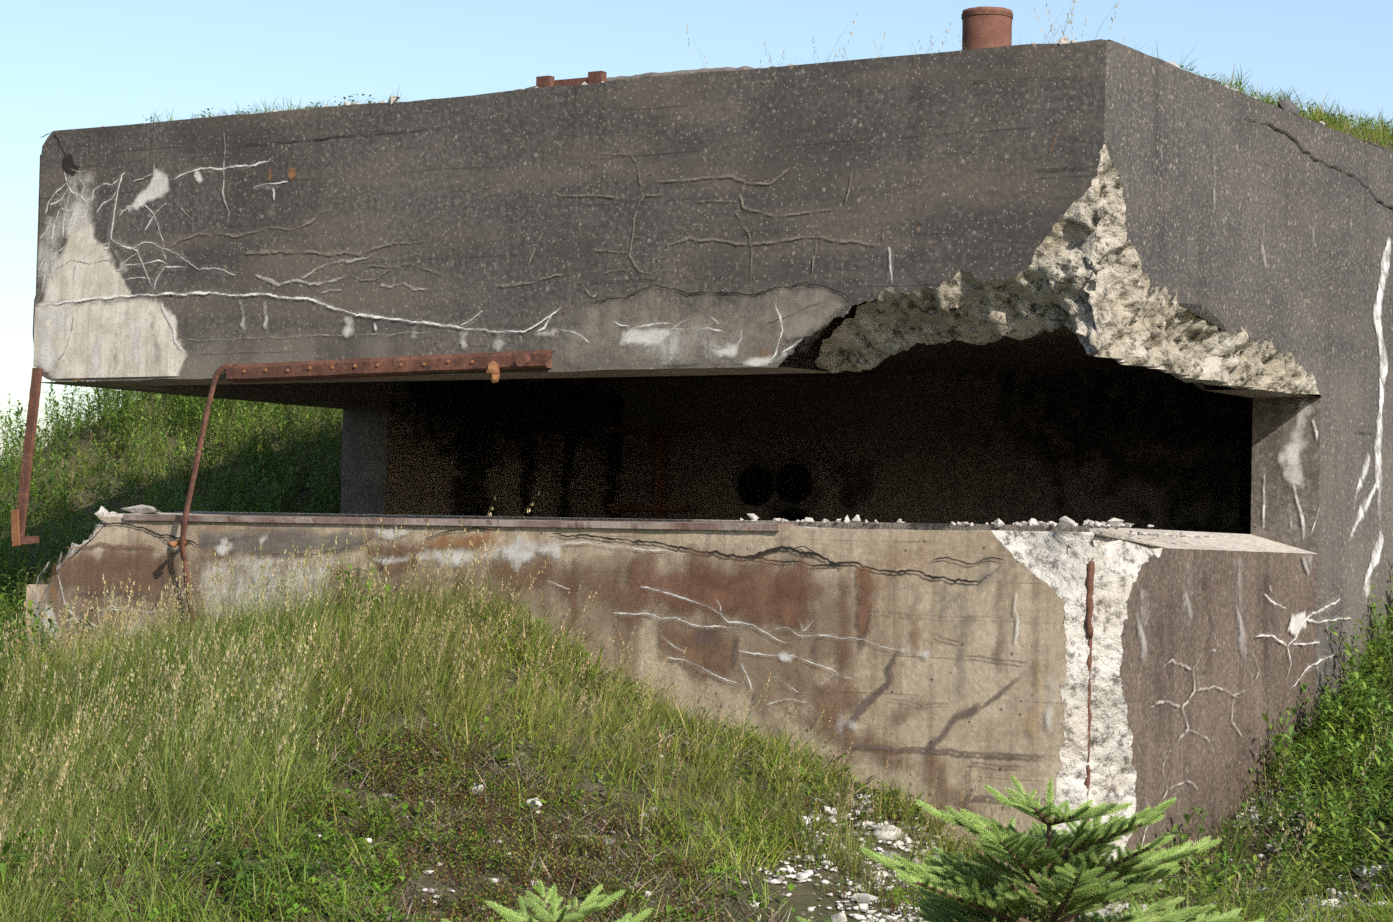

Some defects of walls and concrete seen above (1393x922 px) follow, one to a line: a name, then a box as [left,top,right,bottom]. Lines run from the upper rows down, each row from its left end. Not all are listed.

peeling [40,179,131,305]
crack [40,126,892,367]
spalling [566,144,1319,397]
corrosion [451,552,819,687]
crack [615,586,835,705]
crack [552,533,1004,583]
corrosion [812,566,873,662]
spalling [991,530,1163,861]
crack [1142,586,1350,844]